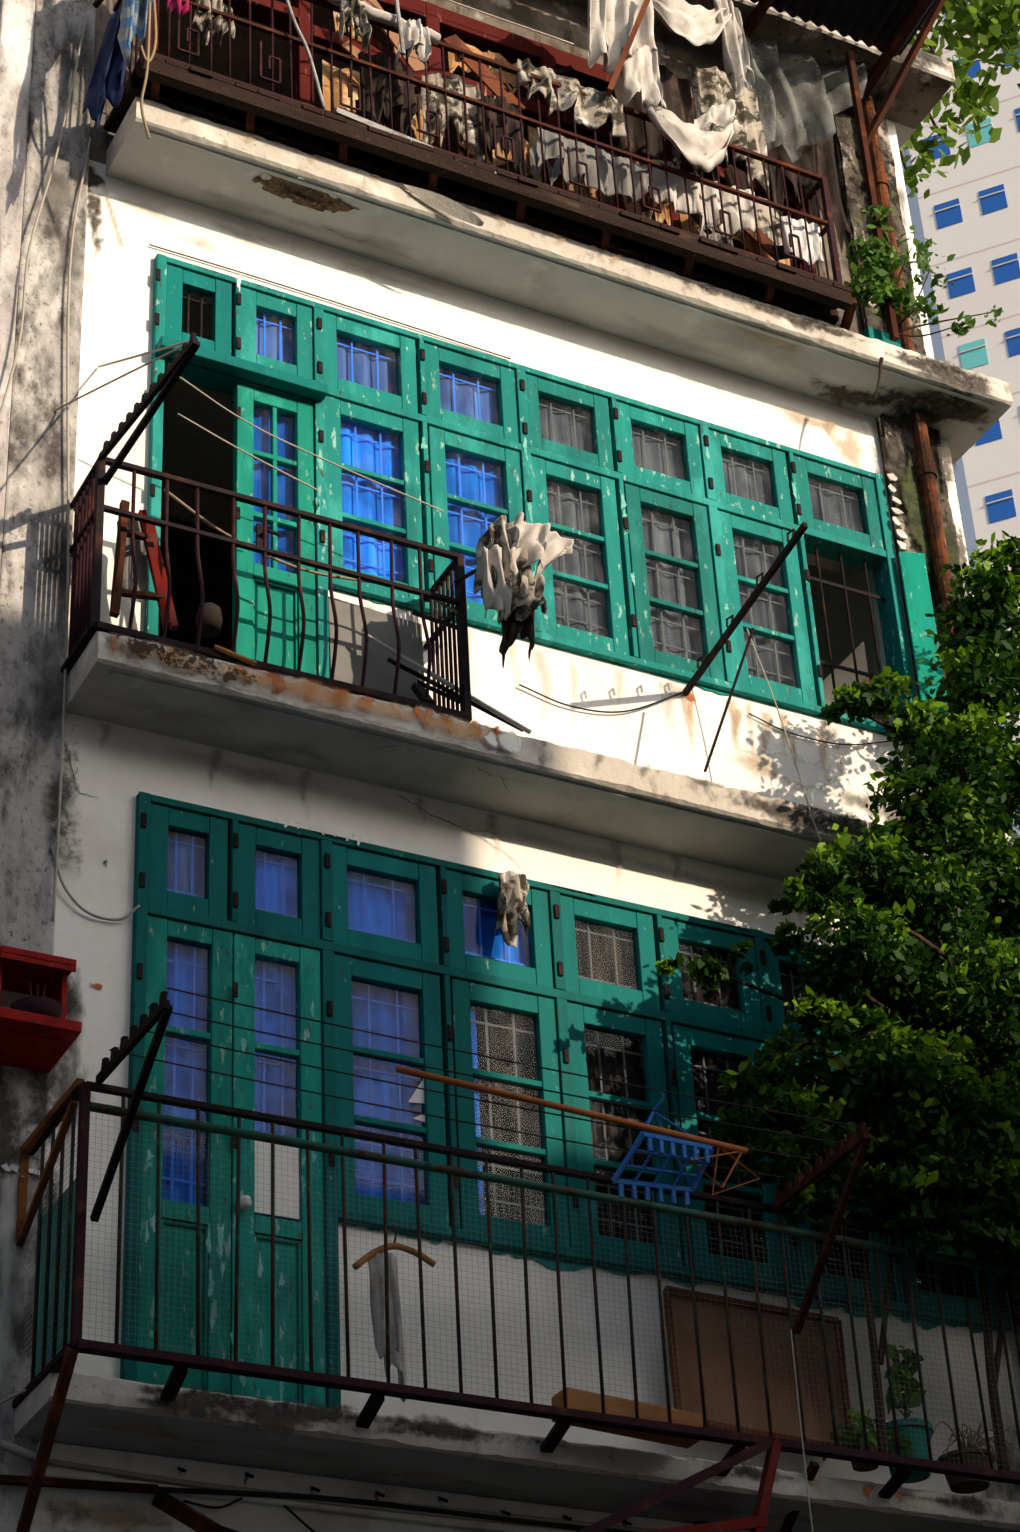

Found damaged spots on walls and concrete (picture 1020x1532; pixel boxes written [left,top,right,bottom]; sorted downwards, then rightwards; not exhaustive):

leakage [65,30,94,131]
leakage [46,166,124,290]
spalling [253,173,359,217]
leakage [684,282,854,346]
leakage [814,351,989,523]
leakage [55,518,73,610]
leakage [948,515,971,597]
rust [116,637,500,751]
leakage [47,749,81,863]
leakage [735,790,900,842]
leakage [141,1387,358,1433]
leakage [382,1415,494,1440]